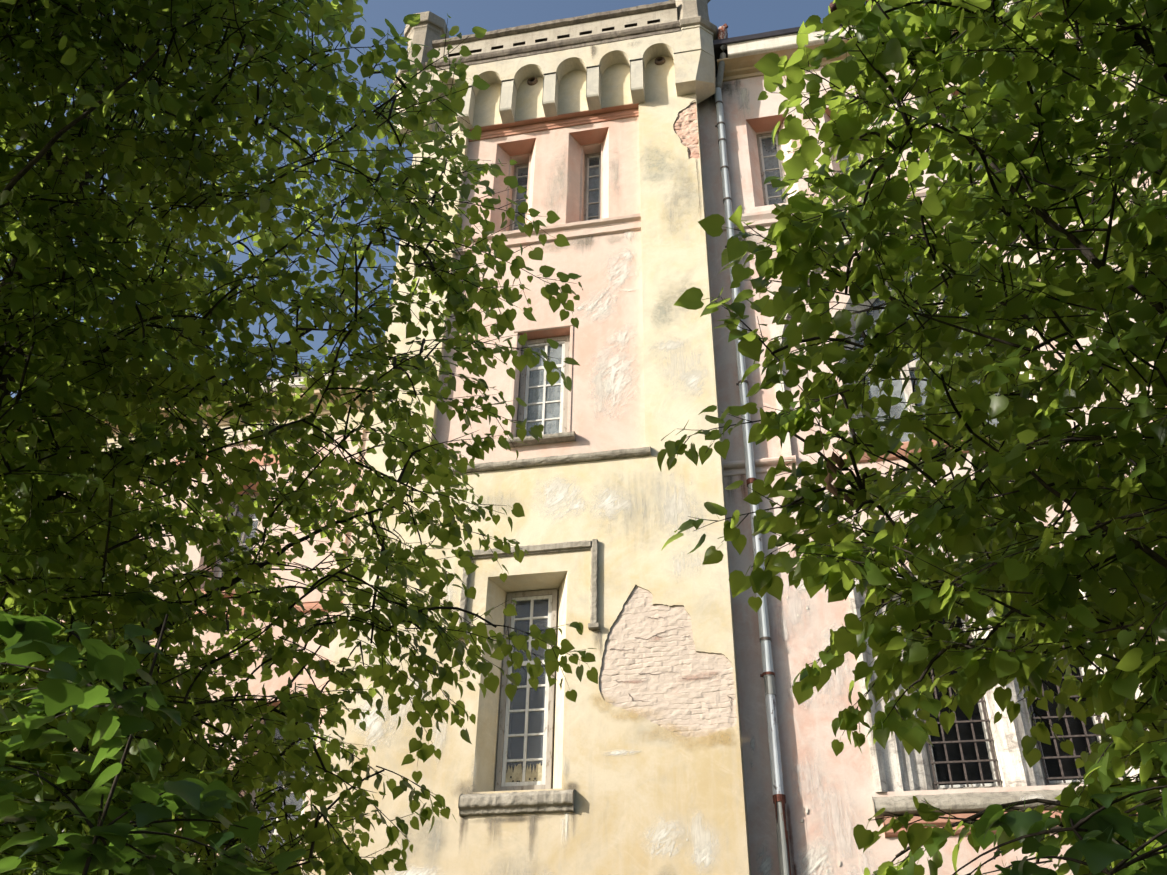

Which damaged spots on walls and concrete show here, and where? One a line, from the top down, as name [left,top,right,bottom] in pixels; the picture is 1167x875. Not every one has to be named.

flaking render [673,100,700,159]
flaking render [599,585,737,738]
leakage [489,815,535,838]